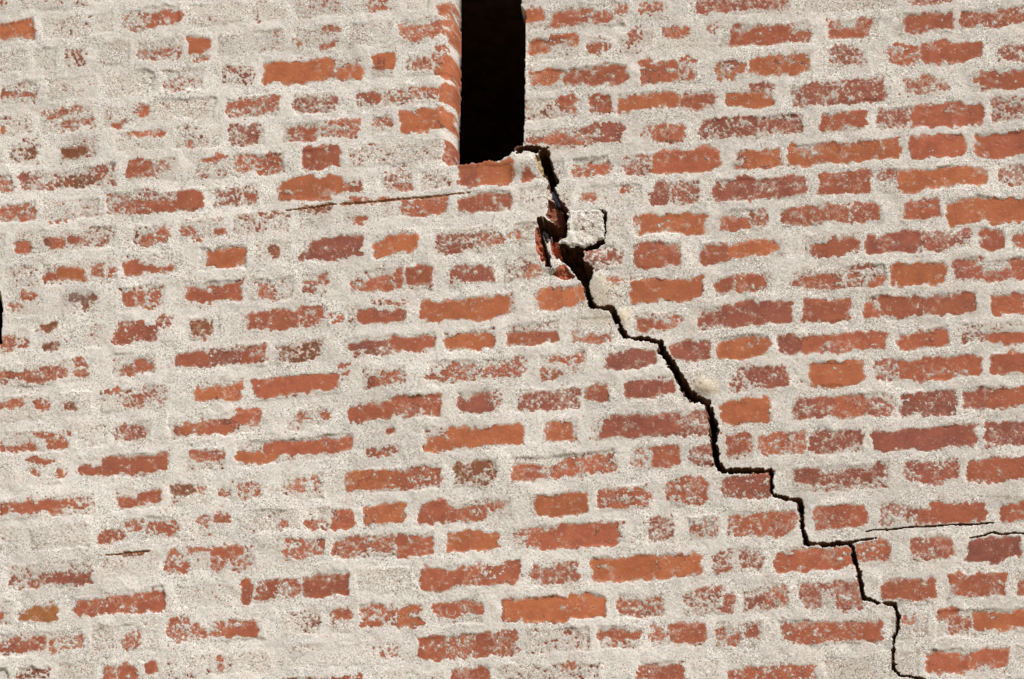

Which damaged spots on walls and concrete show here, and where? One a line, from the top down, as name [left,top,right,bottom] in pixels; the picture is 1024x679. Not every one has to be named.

crack [285,192,470,211]
crack [514,145,1024,679]